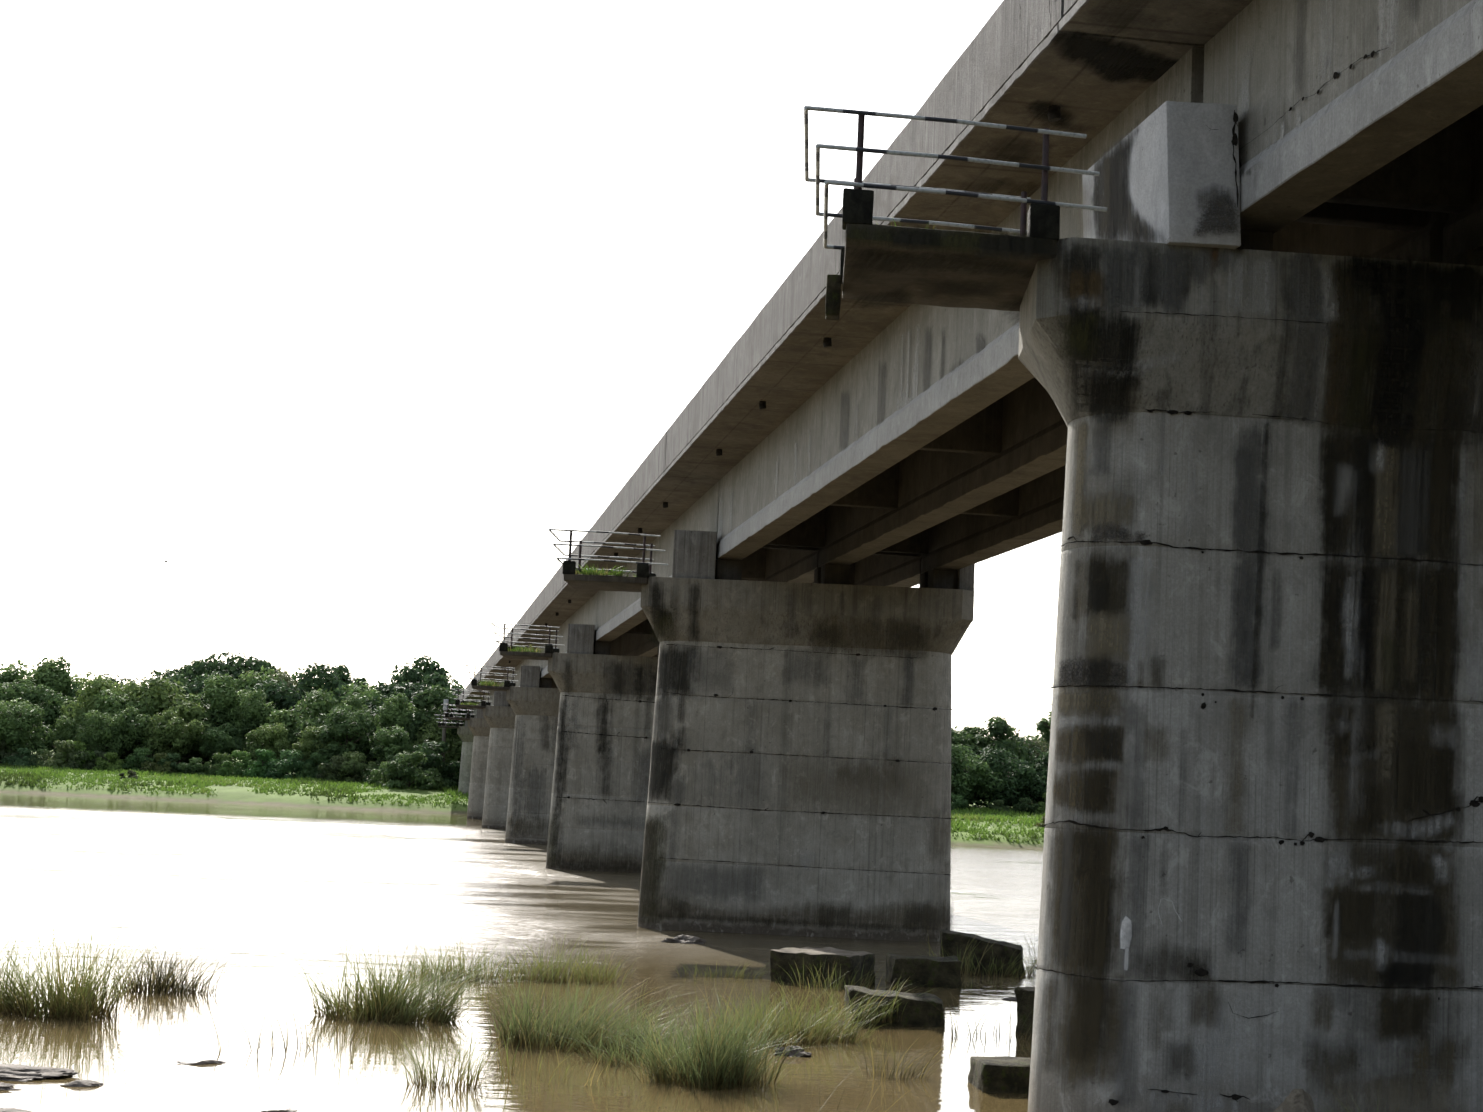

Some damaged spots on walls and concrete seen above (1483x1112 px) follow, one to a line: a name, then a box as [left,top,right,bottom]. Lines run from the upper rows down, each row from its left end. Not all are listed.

damp [1054,33,1179,82]
crack [1207,48,1387,208]
damp [1093,130,1240,311]
damp [1072,324,1176,533]
damp [597,584,699,801]
damp [1053,688,1122,811]
damp [1074,558,1145,670]
damp [1233,430,1280,684]
crack [1042,796,1483,845]
crack [1059,536,1483,566]
damp [1285,252,1483,1112]
damp [1046,828,1121,1082]